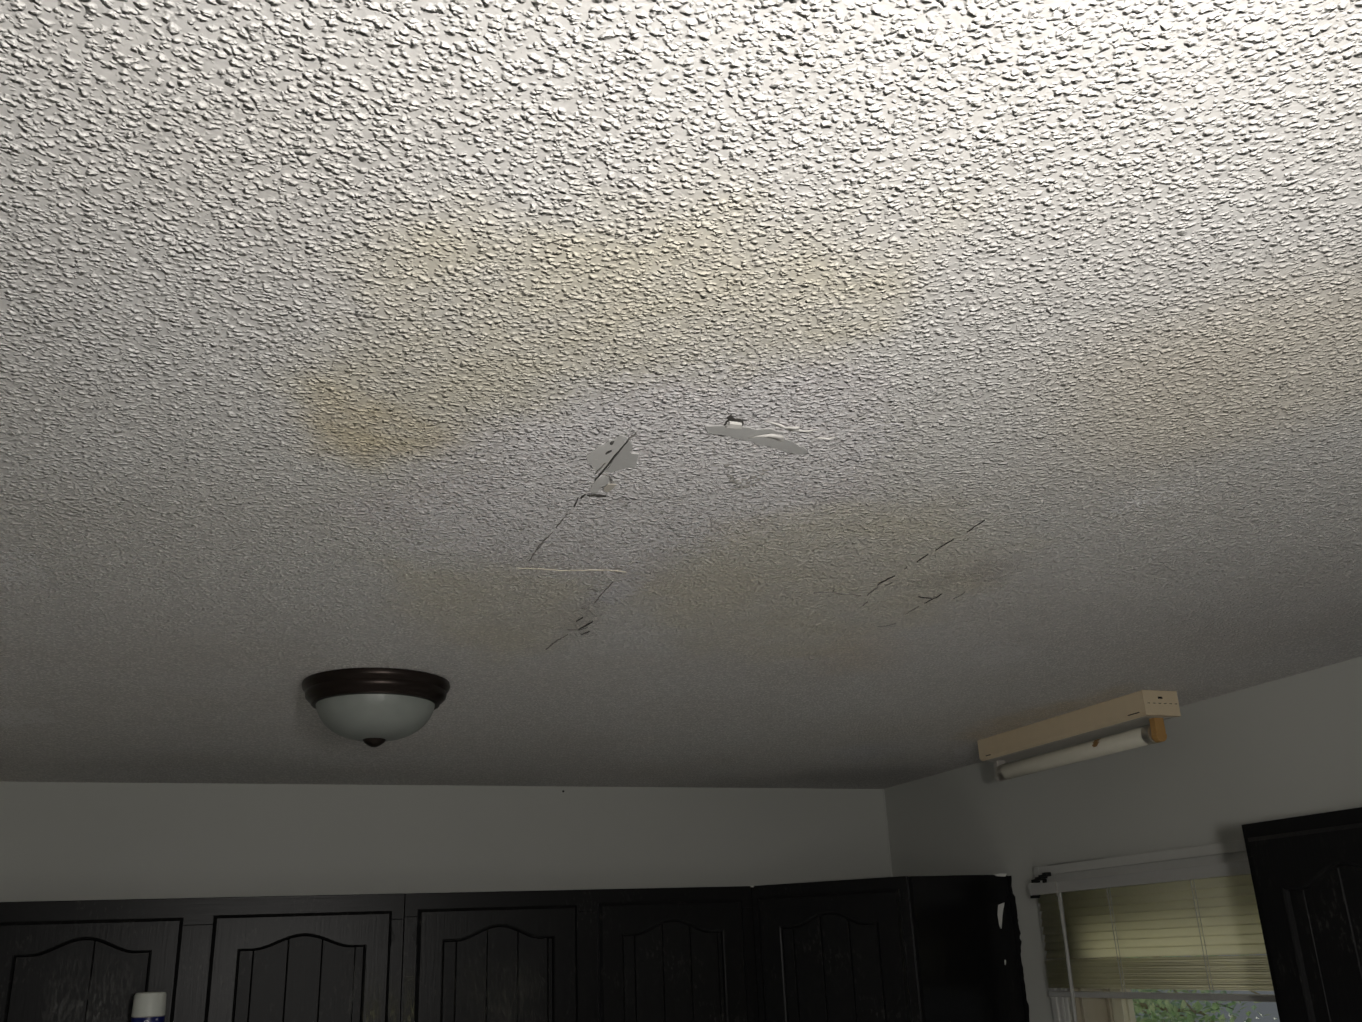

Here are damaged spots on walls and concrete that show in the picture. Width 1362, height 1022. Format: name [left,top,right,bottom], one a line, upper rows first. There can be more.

peeling [586,432,639,481]
peeling [705,415,836,454]
crack [517,494,626,573]
crack [814,499,985,627]